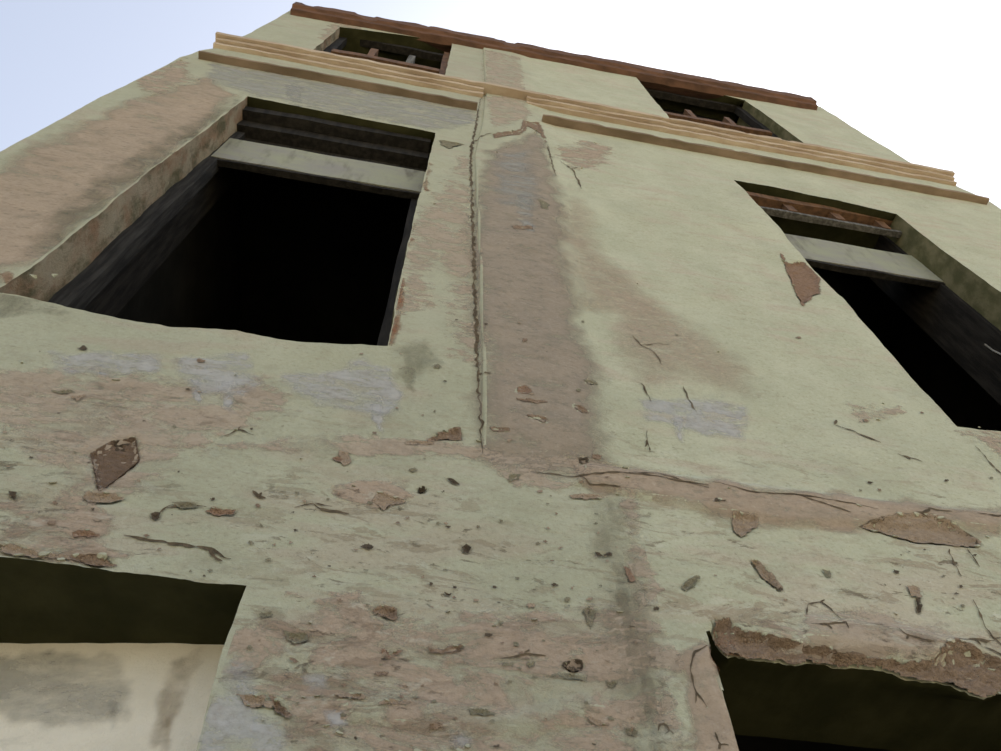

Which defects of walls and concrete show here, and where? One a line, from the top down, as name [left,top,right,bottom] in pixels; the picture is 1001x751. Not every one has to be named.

spalling [440,140,464,148]
crack [469,97,490,453]
peeling [474,120,1001,556]
spalling [405,427,462,445]
peeling [0,437,140,567]
crack [124,535,230,561]
spalling [151,497,236,520]
crack [538,471,1001,575]
crack [690,645,707,705]
spalling [678,605,1001,751]